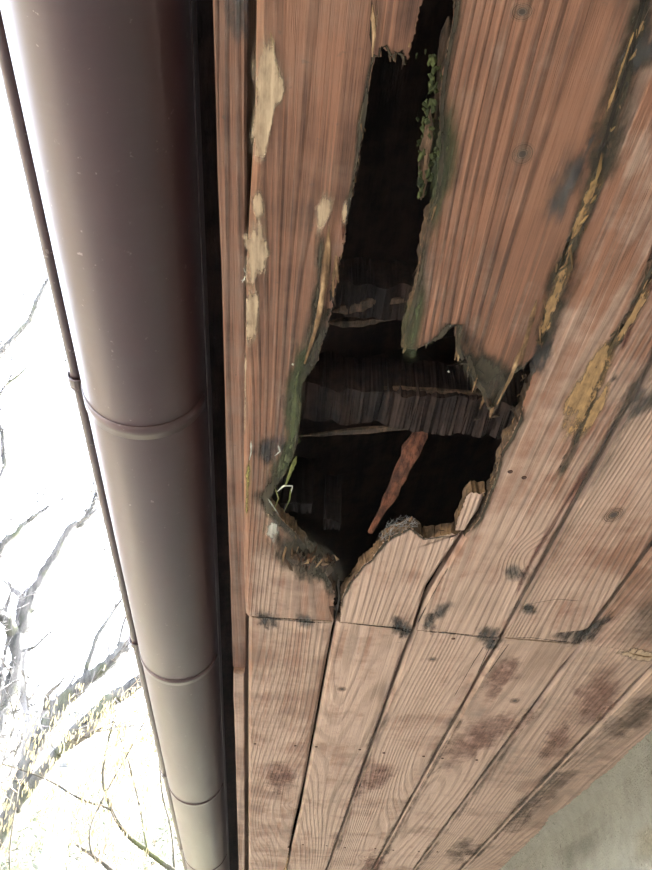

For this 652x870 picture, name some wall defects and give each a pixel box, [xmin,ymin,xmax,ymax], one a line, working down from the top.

peeling [252,32,285,158]
peeling [242,192,269,343]
leakage [259,438,286,464]
leakage [267,523,341,583]
peeling [282,529,339,576]
leakage [610,697,652,735]
leakage [518,773,574,818]